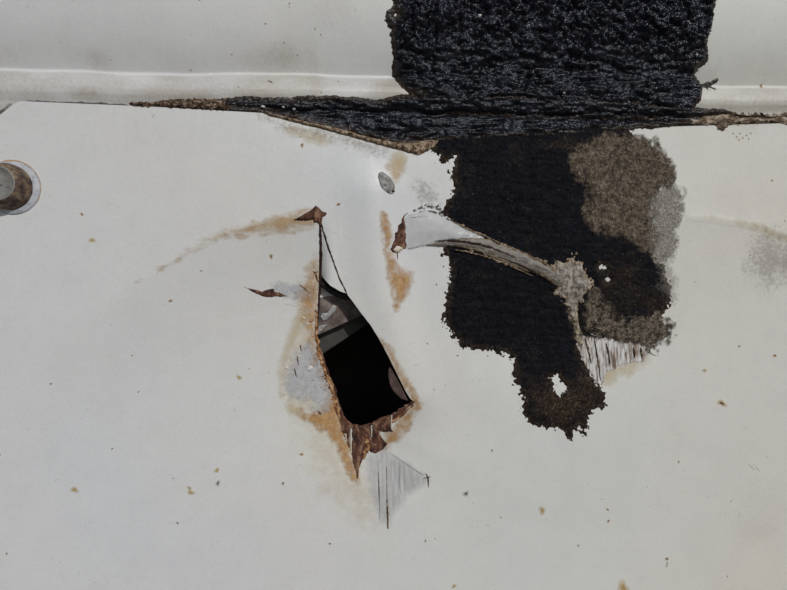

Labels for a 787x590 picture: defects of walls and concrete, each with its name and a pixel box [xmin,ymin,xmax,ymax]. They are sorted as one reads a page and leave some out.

rust [245,287,286,297]
rust [240,206,327,236]
rust [382,213,410,308]
rust [299,275,417,480]